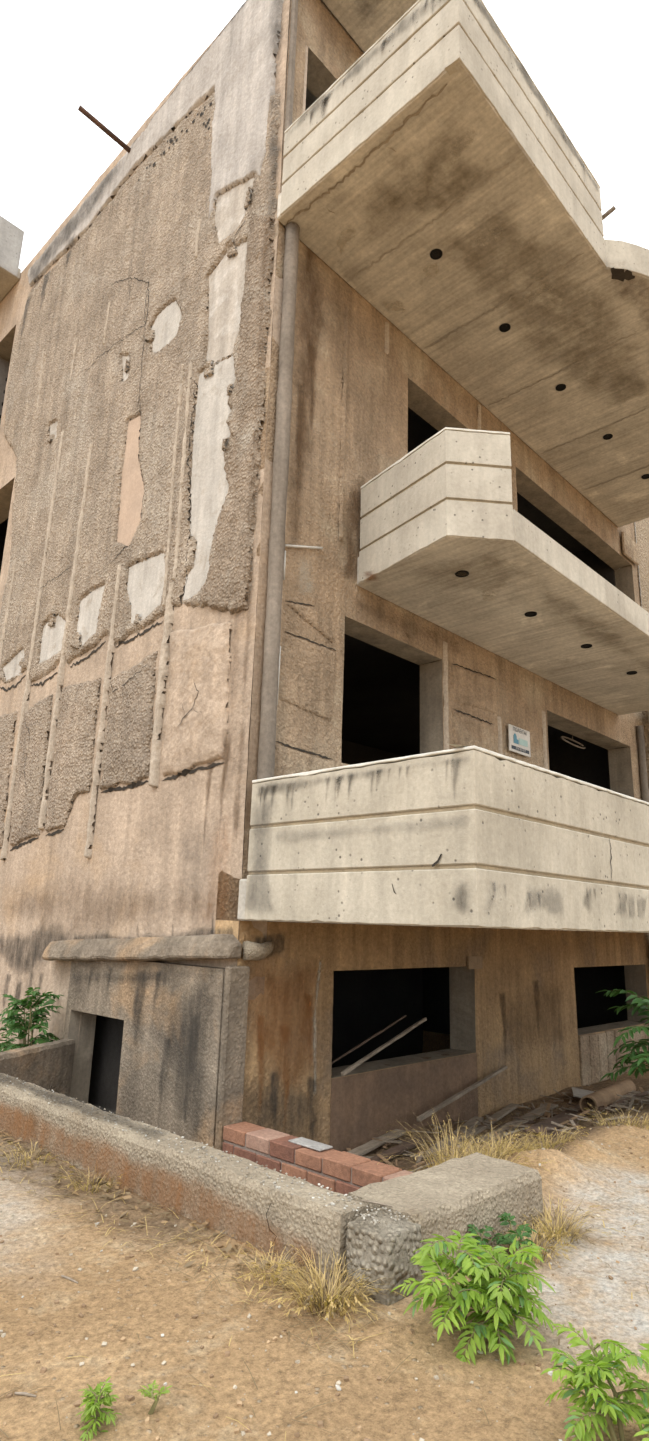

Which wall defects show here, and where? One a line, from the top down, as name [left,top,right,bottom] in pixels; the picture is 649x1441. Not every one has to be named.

peeling [144,301,182,353]
peeling [122,355,130,381]
peeling [183,177,254,604]
peeling [117,416,144,546]
peeling [127,553,165,624]
peeling [3,585,105,681]
damp [2,932,64,1001]